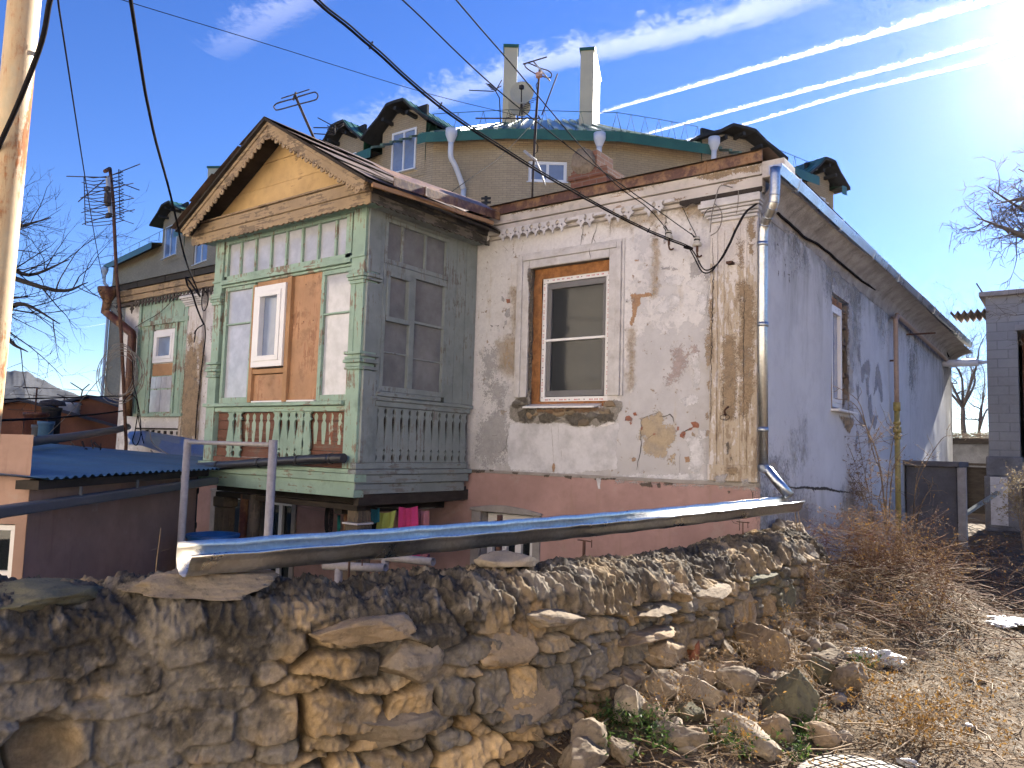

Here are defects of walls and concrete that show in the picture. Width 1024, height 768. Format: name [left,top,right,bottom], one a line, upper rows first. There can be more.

peeling [472,237,757,494]
crack [787,485,849,493]